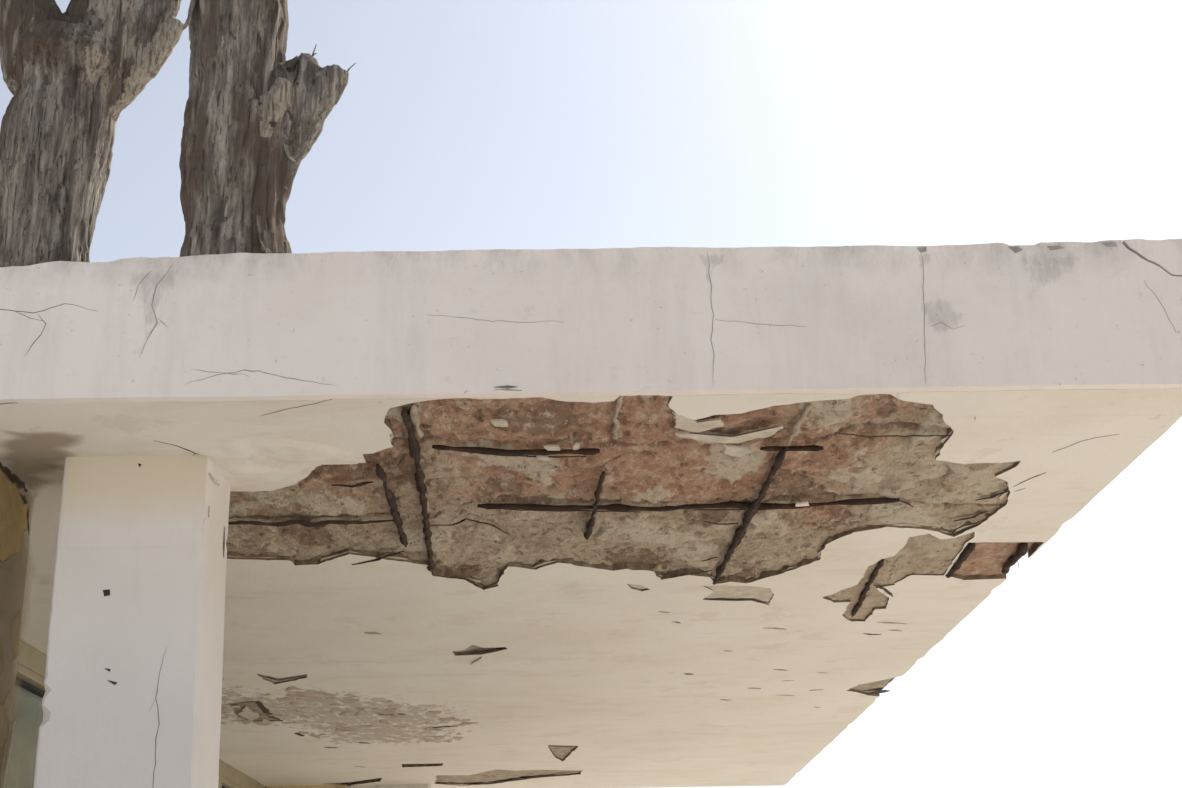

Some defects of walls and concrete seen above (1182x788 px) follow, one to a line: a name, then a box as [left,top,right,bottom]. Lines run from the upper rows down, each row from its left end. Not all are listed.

crack [0,303,96,356]
crack [133,265,172,355]
crack [707,253,806,368]
crack [187,369,332,416]
peeling [0,469,29,562]
leakage [9,435,71,505]
spalling [210,385,1035,635]
leakage [0,531,29,788]
crack [153,648,167,784]
flaking render [402,745,581,786]